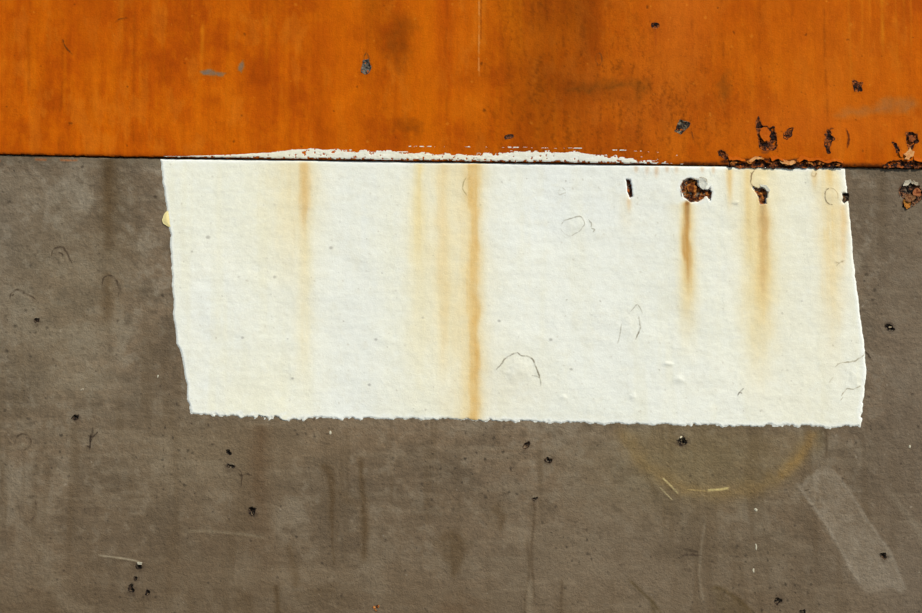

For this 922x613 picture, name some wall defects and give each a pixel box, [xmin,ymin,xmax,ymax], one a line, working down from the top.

peeling [680,114,922,170]
corrosion [614,191,641,248]
corrosion [632,166,681,180]
spalling [679,177,713,204]
spalling [751,184,770,207]
spalling [897,180,922,209]
corrosion [239,161,352,410]
corrosion [403,163,511,421]
corrosion [663,167,857,416]